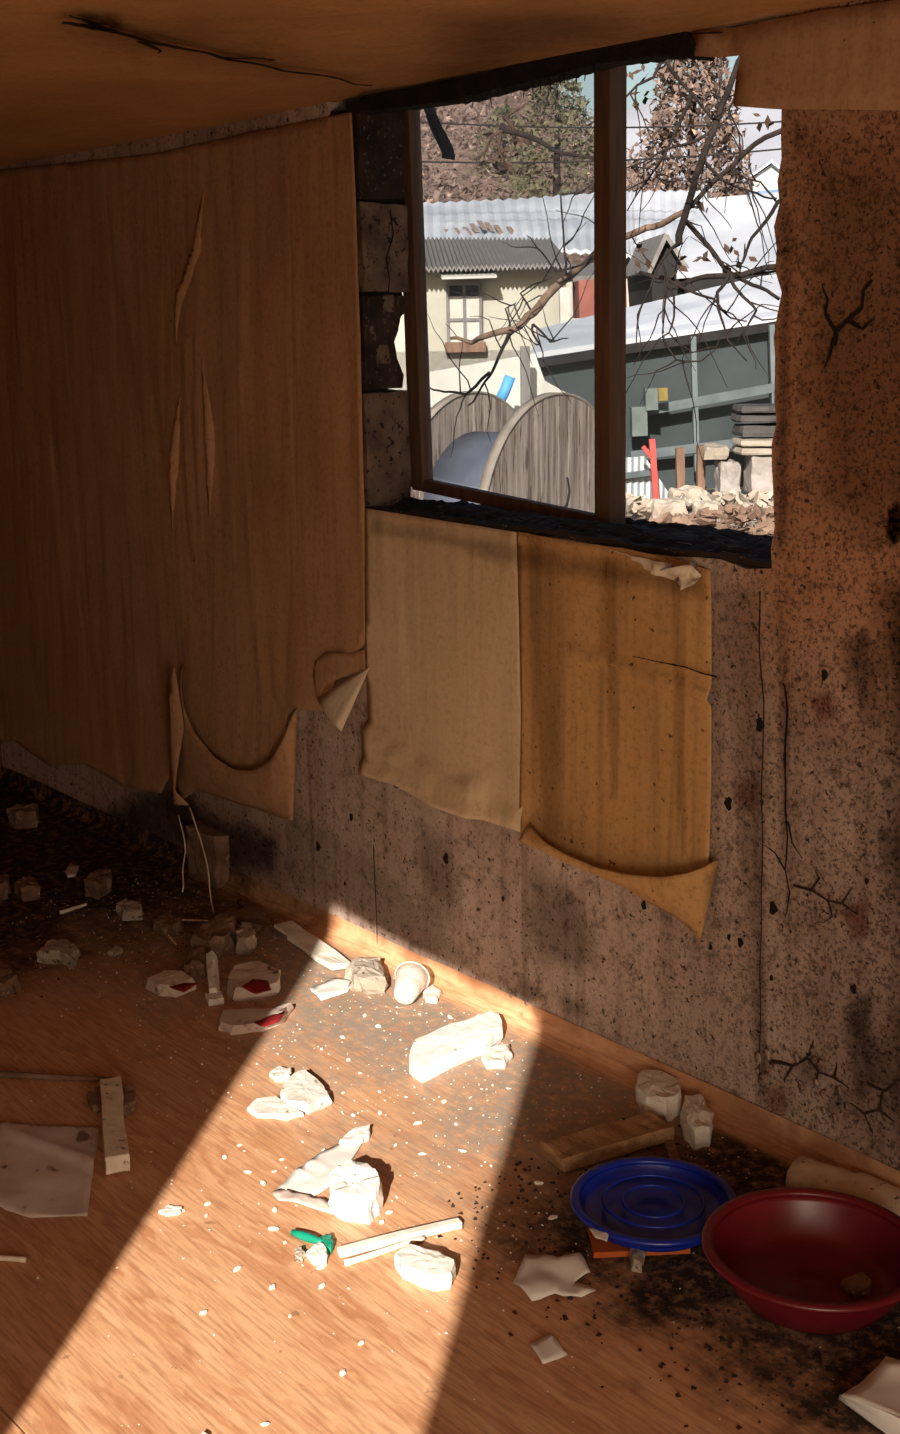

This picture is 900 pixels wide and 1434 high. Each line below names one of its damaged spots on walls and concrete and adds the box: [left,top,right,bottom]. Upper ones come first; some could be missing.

crack [61,15,446,98]
crack [822,279,874,367]
crack [758,592,897,1134]